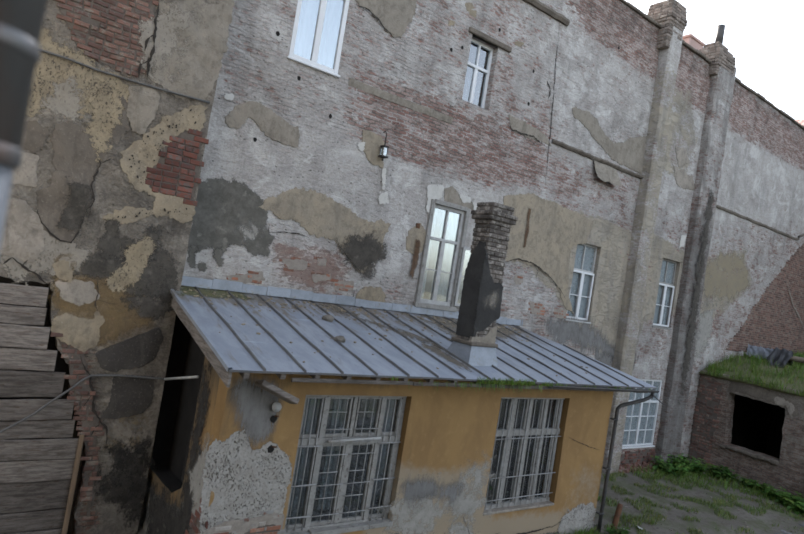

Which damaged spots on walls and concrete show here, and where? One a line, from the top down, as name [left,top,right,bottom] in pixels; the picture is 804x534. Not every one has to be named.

spalling [55,0,159,77]
crack [509,22,560,184]
spalling [145,128,209,207]
damp [0,176,275,320]
peeling [259,187,391,274]
peeling [503,193,594,316]
damp [679,188,750,404]
damp [93,354,213,534]
peeling [185,429,293,534]